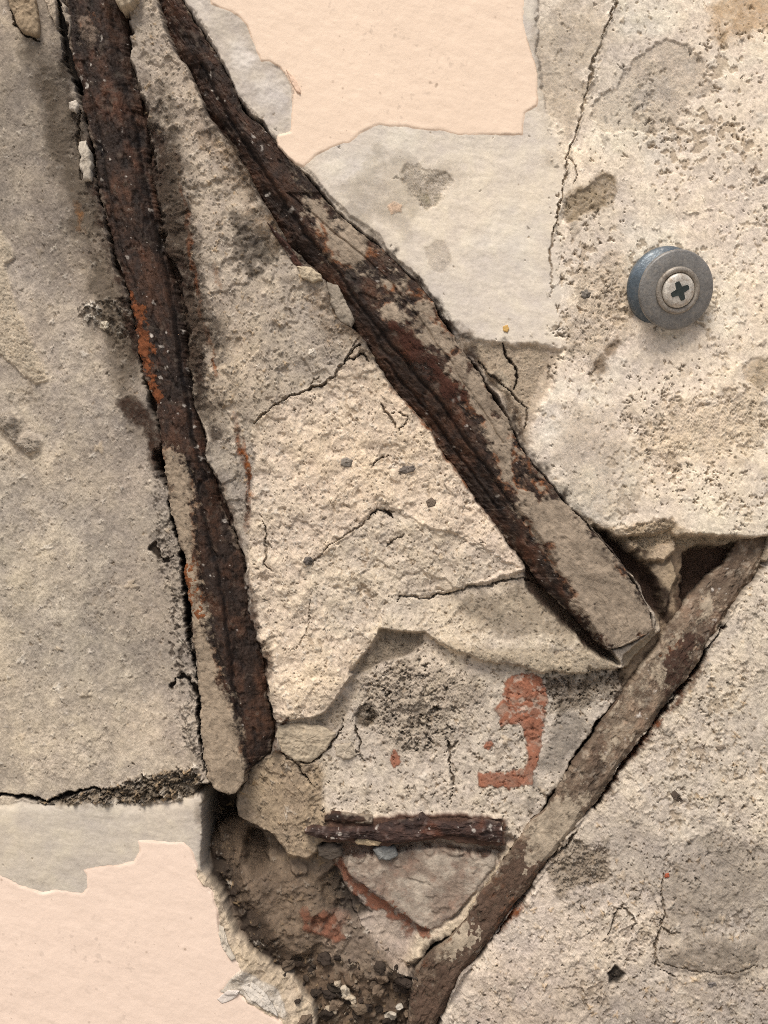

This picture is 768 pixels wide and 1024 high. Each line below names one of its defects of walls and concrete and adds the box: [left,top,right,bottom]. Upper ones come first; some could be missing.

crack [549,0,618,266]
rust [410,276,457,336]
crack [265,345,369,413]
crack [478,343,528,426]
rust [524,562,613,658]
rust [595,529,727,623]
crack [0,786,161,805]
rust [305,810,502,860]
spalling [221,814,333,954]
spalling [335,860,430,938]
peeling [218,925,236,961]
peeling [217,972,286,1018]